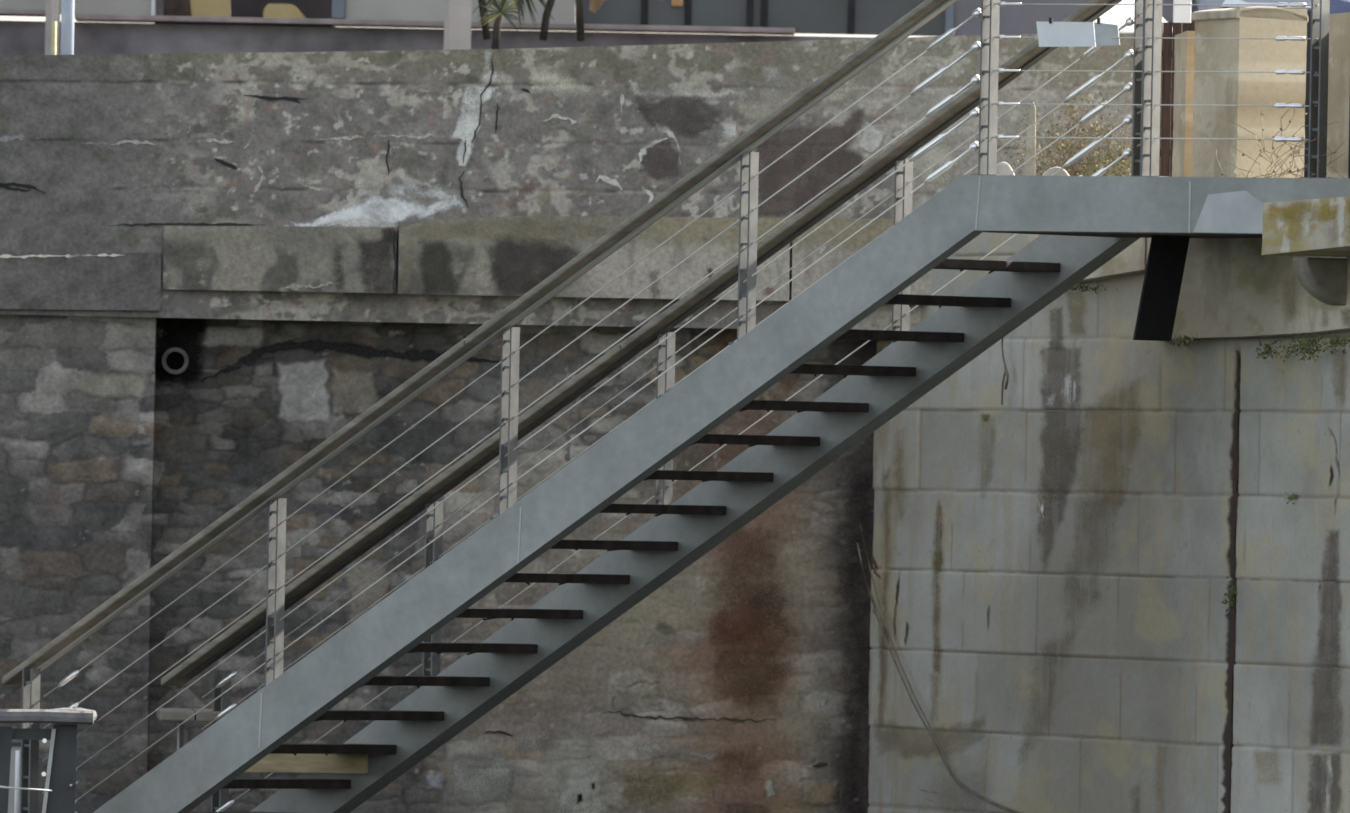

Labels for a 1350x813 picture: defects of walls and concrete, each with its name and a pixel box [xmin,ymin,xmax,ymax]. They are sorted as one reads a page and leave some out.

crack [0,182,45,194]
water stain [1039,292,1138,601]
water stain [1309,532,1342,813]